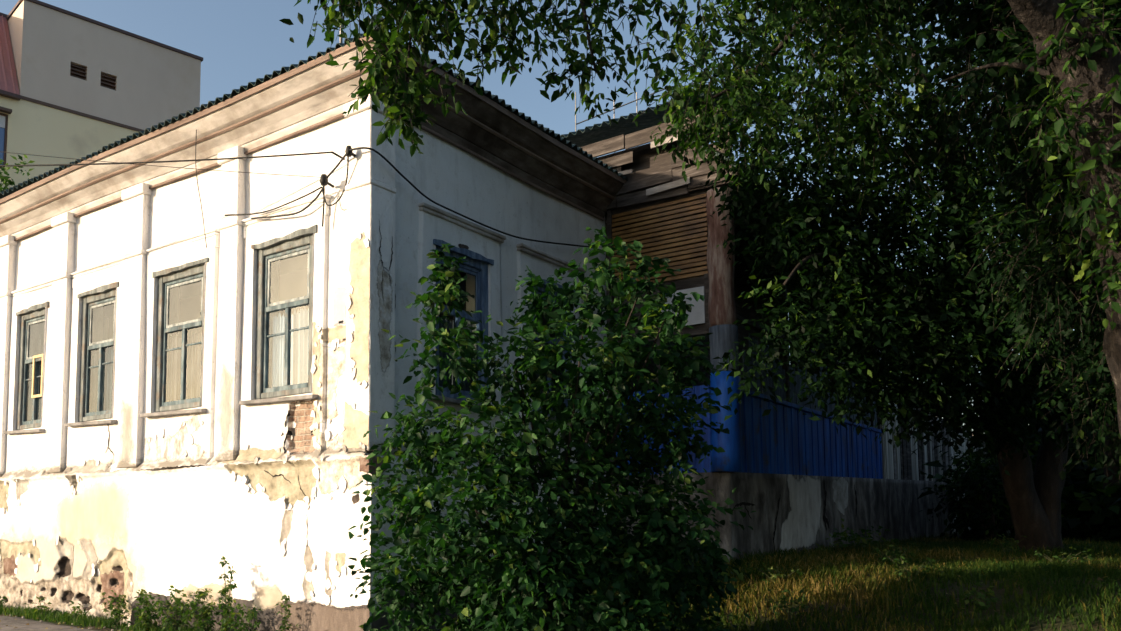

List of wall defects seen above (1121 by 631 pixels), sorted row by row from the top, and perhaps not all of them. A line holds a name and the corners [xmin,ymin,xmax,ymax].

crack [379,221,396,307]
spalling [222,232,392,557]
spalling [0,479,29,514]
spalling [64,460,111,495]
spalling [0,536,133,624]
damp [0,484,138,605]
peeling [302,539,346,606]